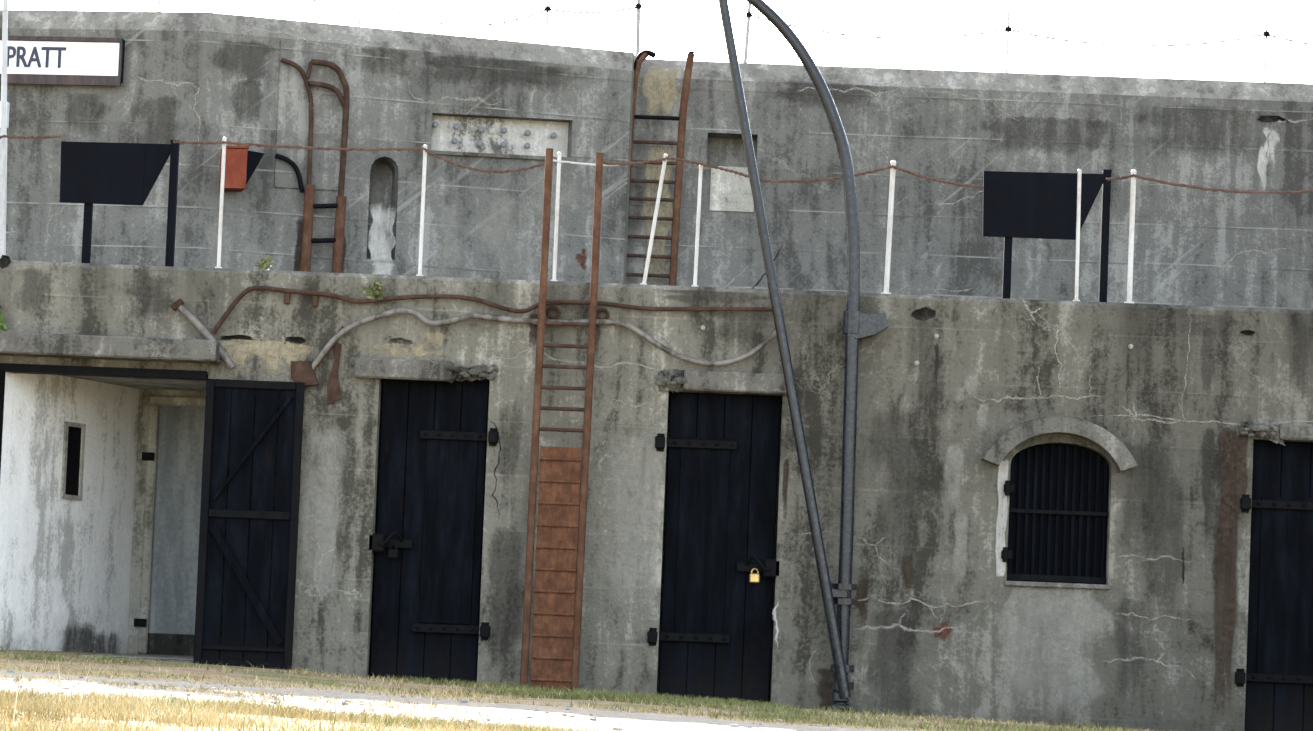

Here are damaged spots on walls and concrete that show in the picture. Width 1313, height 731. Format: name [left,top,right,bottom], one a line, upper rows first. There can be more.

leakage [368,206,394,275]
crack [1118,547,1190,582]
corrosion [1214,429,1248,697]
crack [860,598,981,633]